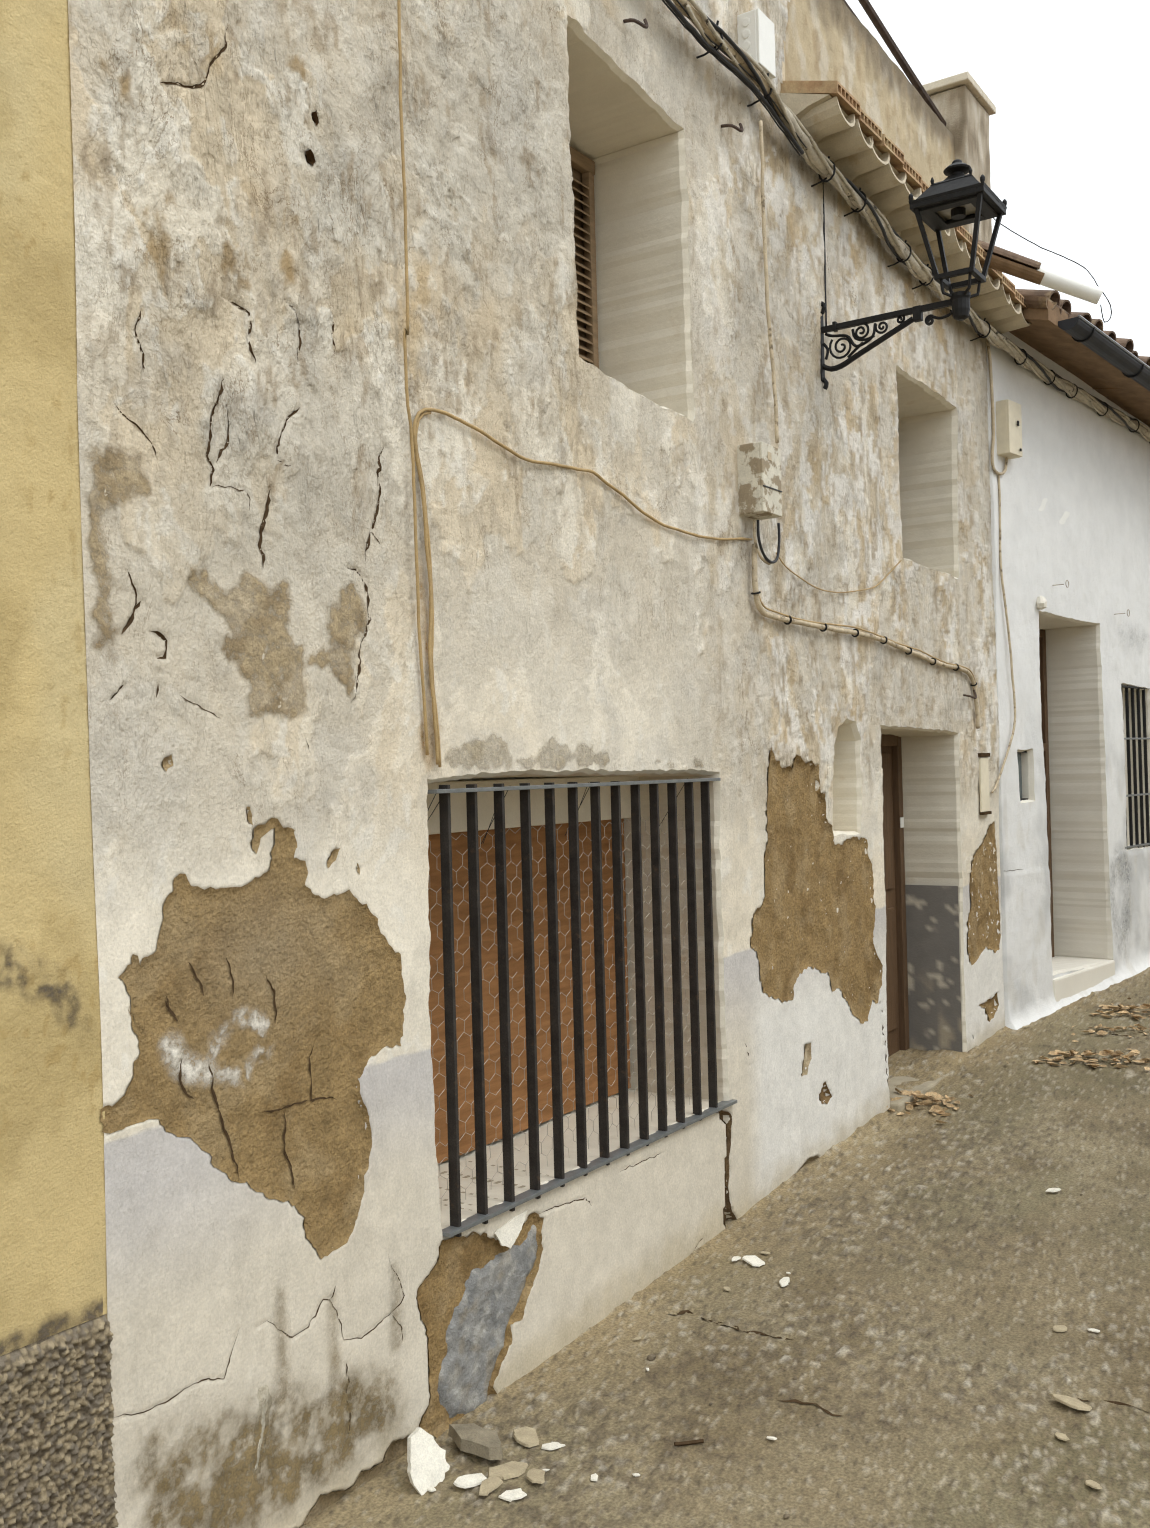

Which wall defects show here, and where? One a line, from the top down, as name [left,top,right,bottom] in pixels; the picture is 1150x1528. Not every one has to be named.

crack [161,27,228,89]
crack [135,311,145,369]
crack [231,302,256,362]
crack [116,406,156,455]
crack [206,379,299,568]
crack [351,447,384,699]
spalling [750,746,883,1024]
spalling [967,822,1001,965]
spalling [100,807,406,1259]
crack [114,1260,405,1431]
leakage [145,1377,396,1528]
spalling [299,1210,544,1528]